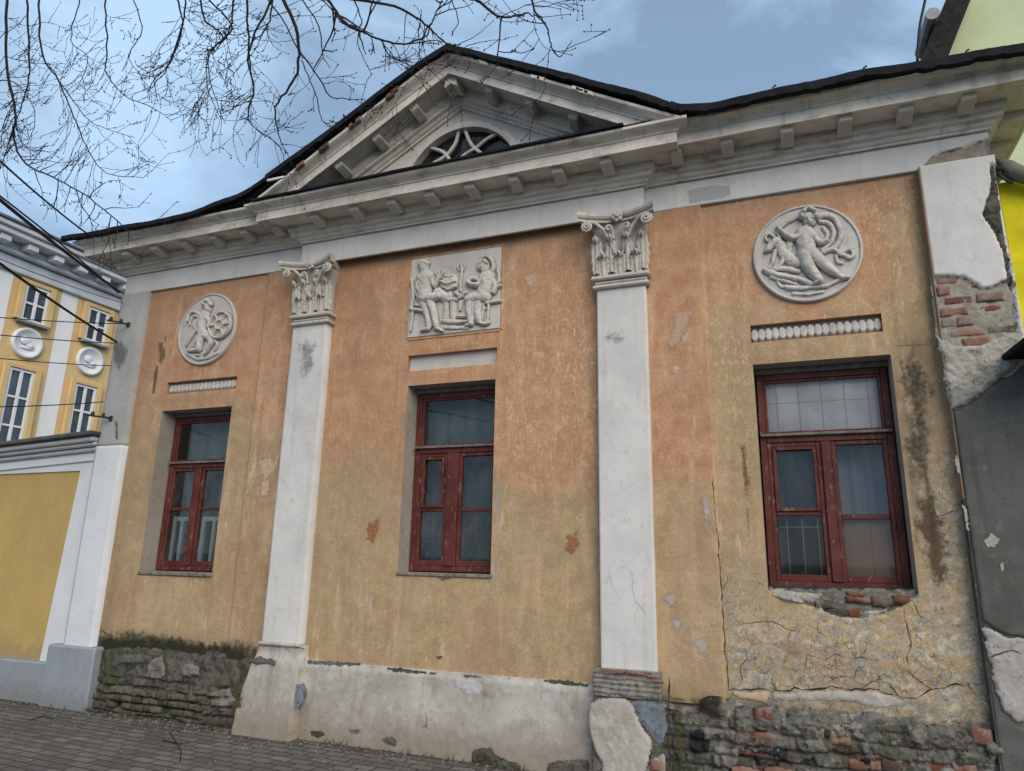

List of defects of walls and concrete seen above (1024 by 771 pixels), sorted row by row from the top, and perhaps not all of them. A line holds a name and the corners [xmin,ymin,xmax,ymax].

flaking render [926,140,1024,410]
peeling [367,518,379,542]
peeling [566,535,579,553]
flaking render [769,586,916,618]
crack [712,478,1020,699]
peeling [295,683,307,710]
flaking render [689,691,1006,771]